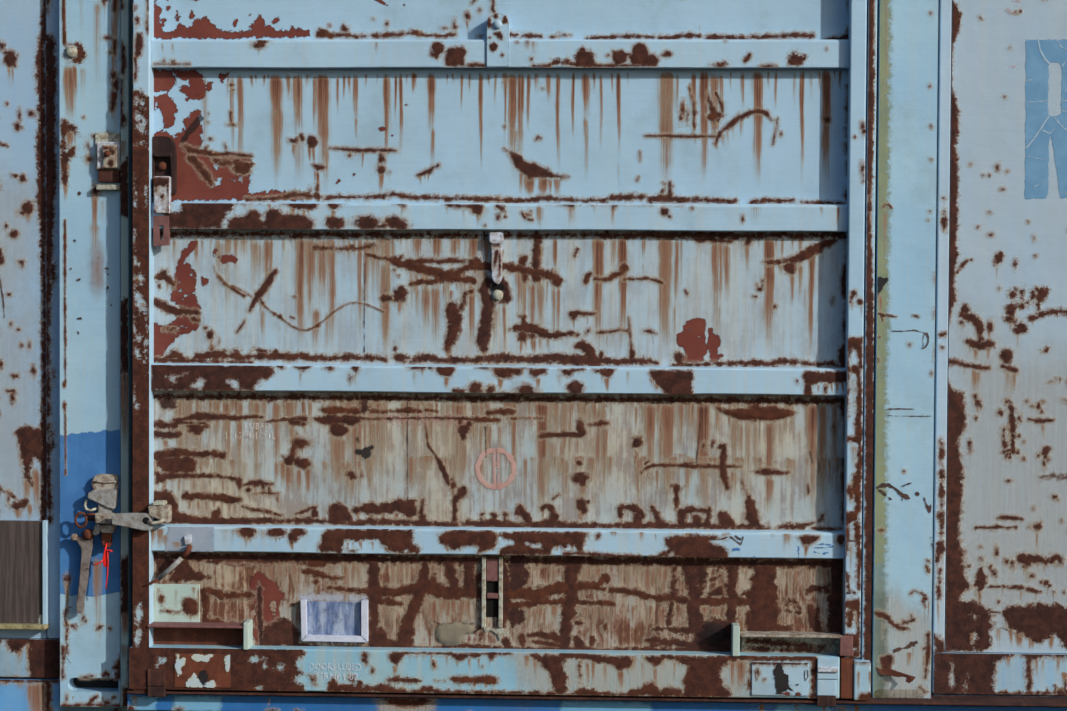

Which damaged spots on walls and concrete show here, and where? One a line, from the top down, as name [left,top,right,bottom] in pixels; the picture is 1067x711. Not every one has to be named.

peeling [154,0,310,40]
rust [61,0,888,711]
peeling [676,317,724,363]
rust [928,0,1050,386]